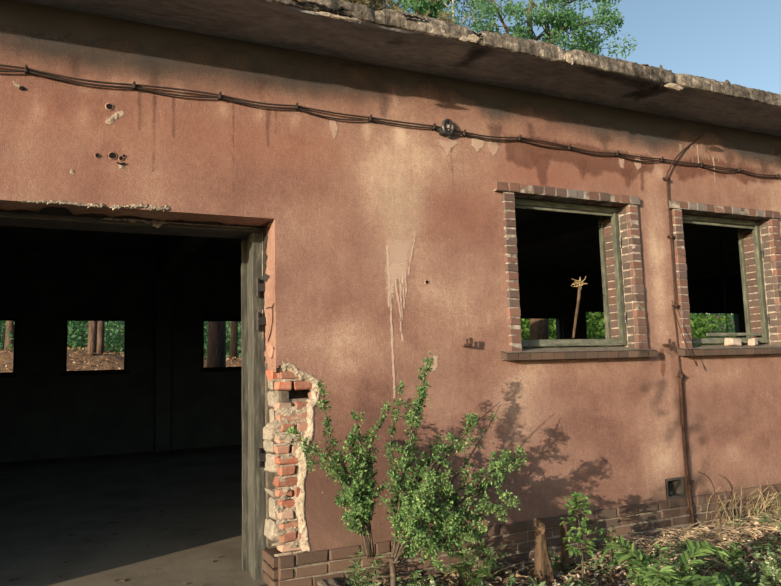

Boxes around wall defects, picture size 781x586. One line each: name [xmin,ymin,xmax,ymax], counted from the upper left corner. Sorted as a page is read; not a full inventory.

water stain [0,0,781,189]
spalling [20,200,182,228]
water stain [386,238,415,398]
spalling [263,343,320,557]